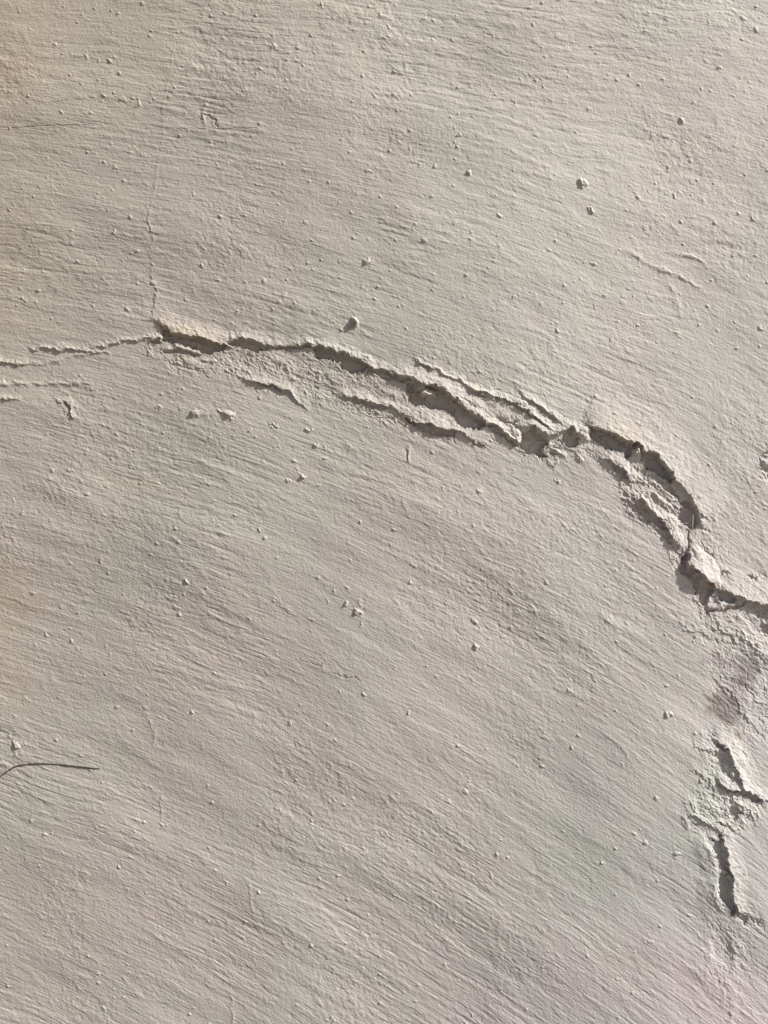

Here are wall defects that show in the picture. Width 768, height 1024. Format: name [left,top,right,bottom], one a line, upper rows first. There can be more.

crack [0,0,768,664]
crack [682,675,768,1024]